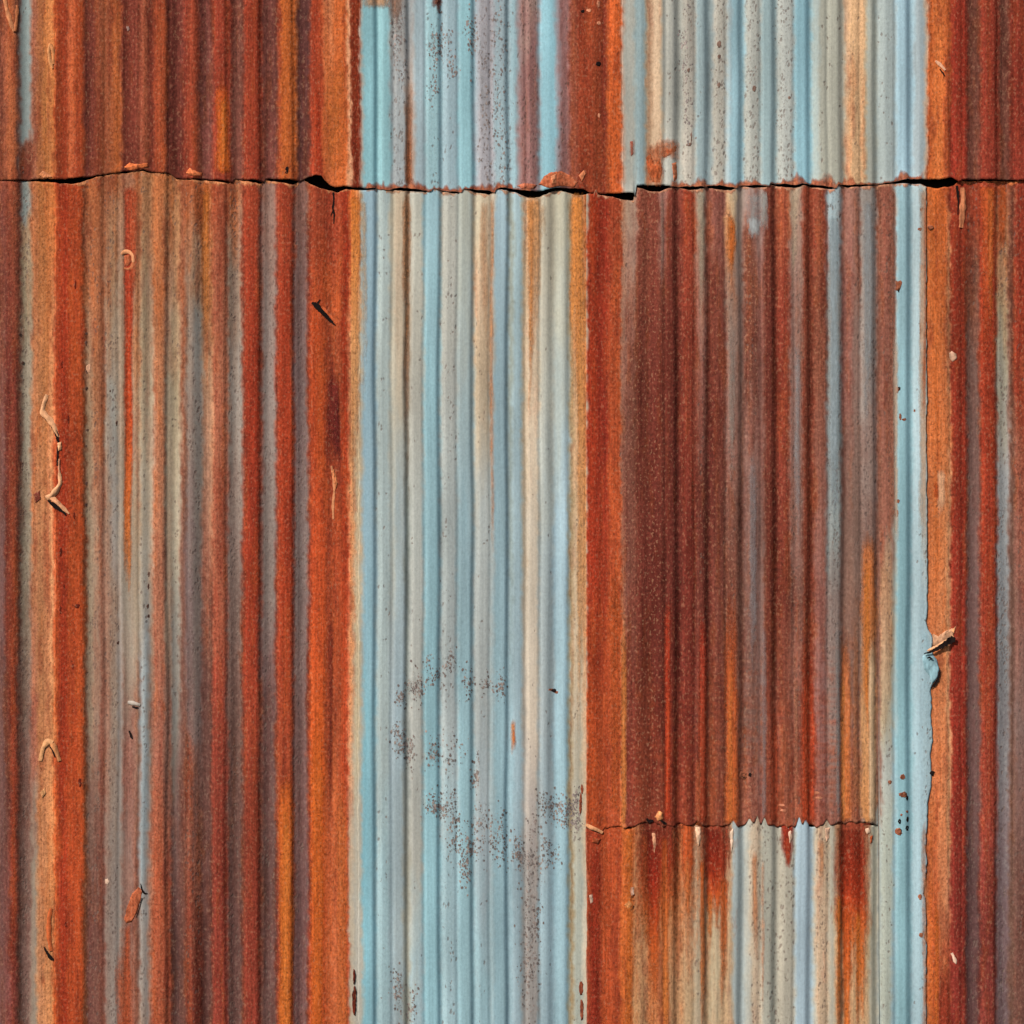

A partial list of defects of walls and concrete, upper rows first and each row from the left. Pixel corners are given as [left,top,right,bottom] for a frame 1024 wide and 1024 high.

crack [0,169,1022,224]
rust [71,0,926,647]
peeling [34,394,69,516]
rust [116,884,148,1024]
rust [279,784,293,1024]
rust [337,799,347,1024]
rust [388,646,583,1024]
rust [612,615,738,1024]
rust [771,724,793,865]
rust [801,670,816,822]
rust [819,544,889,1024]
peeling [922,653,941,688]